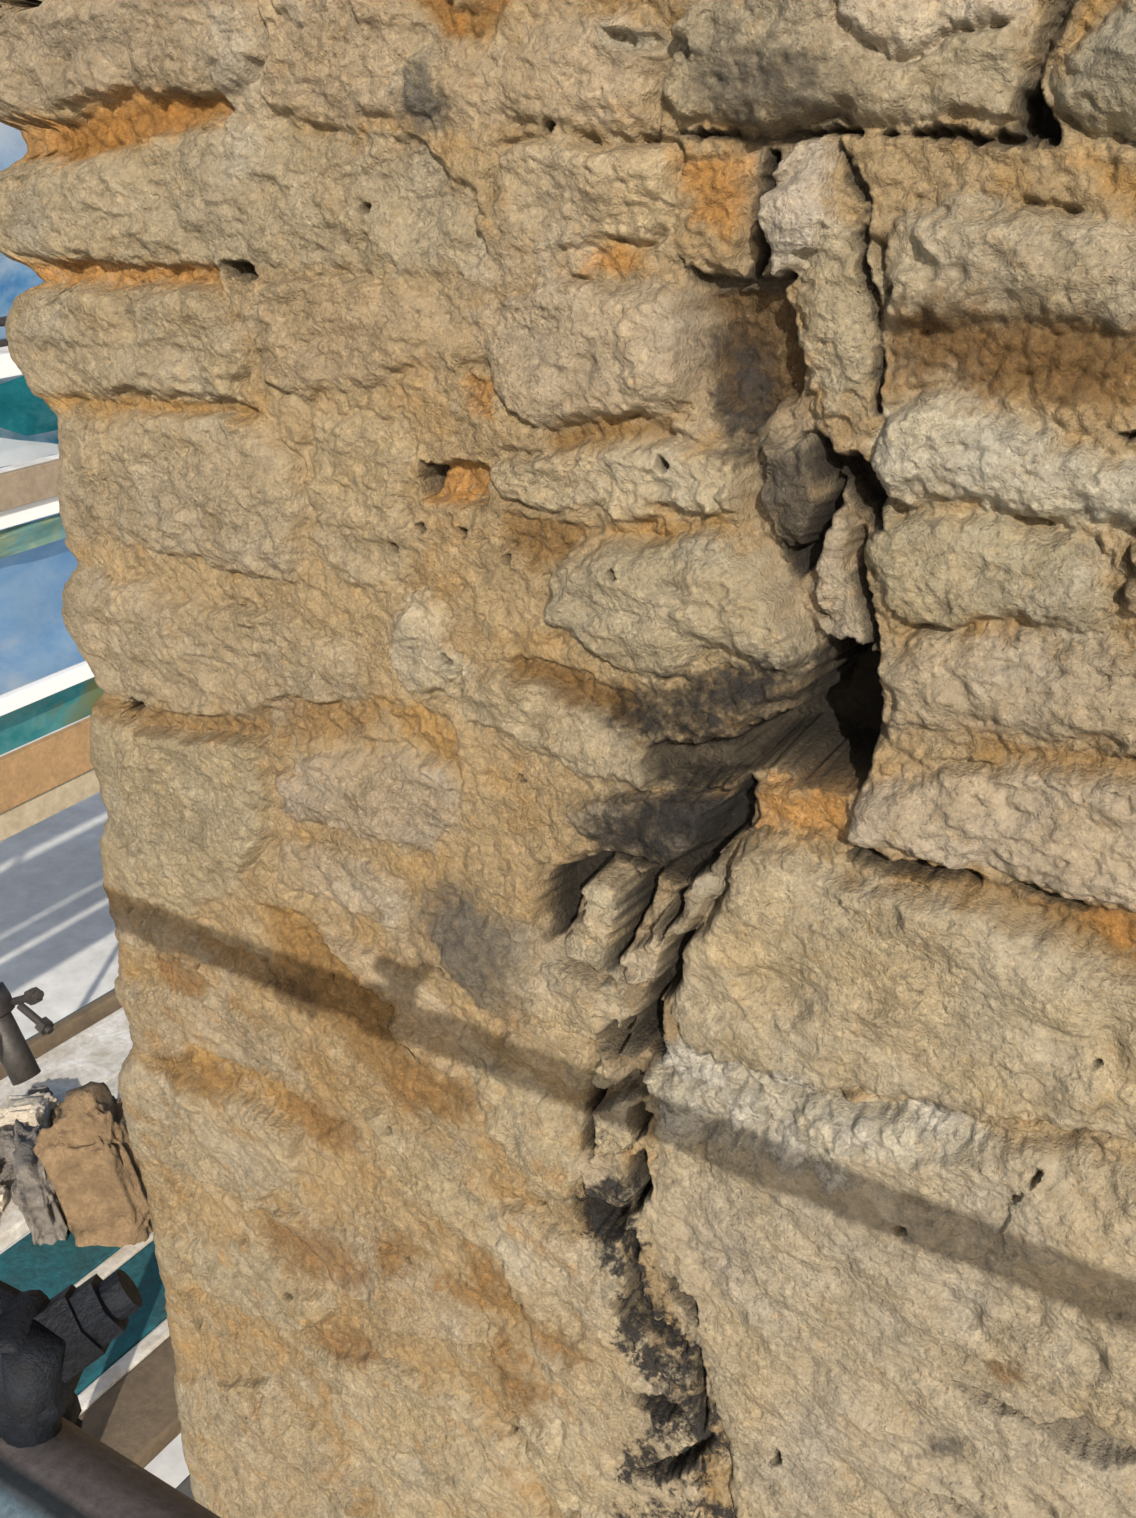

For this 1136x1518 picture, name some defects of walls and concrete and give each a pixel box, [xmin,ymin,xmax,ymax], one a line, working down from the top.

crack [647,121,1039,298]
crack [539,427,889,1485]
damp [575,1155,750,1518]